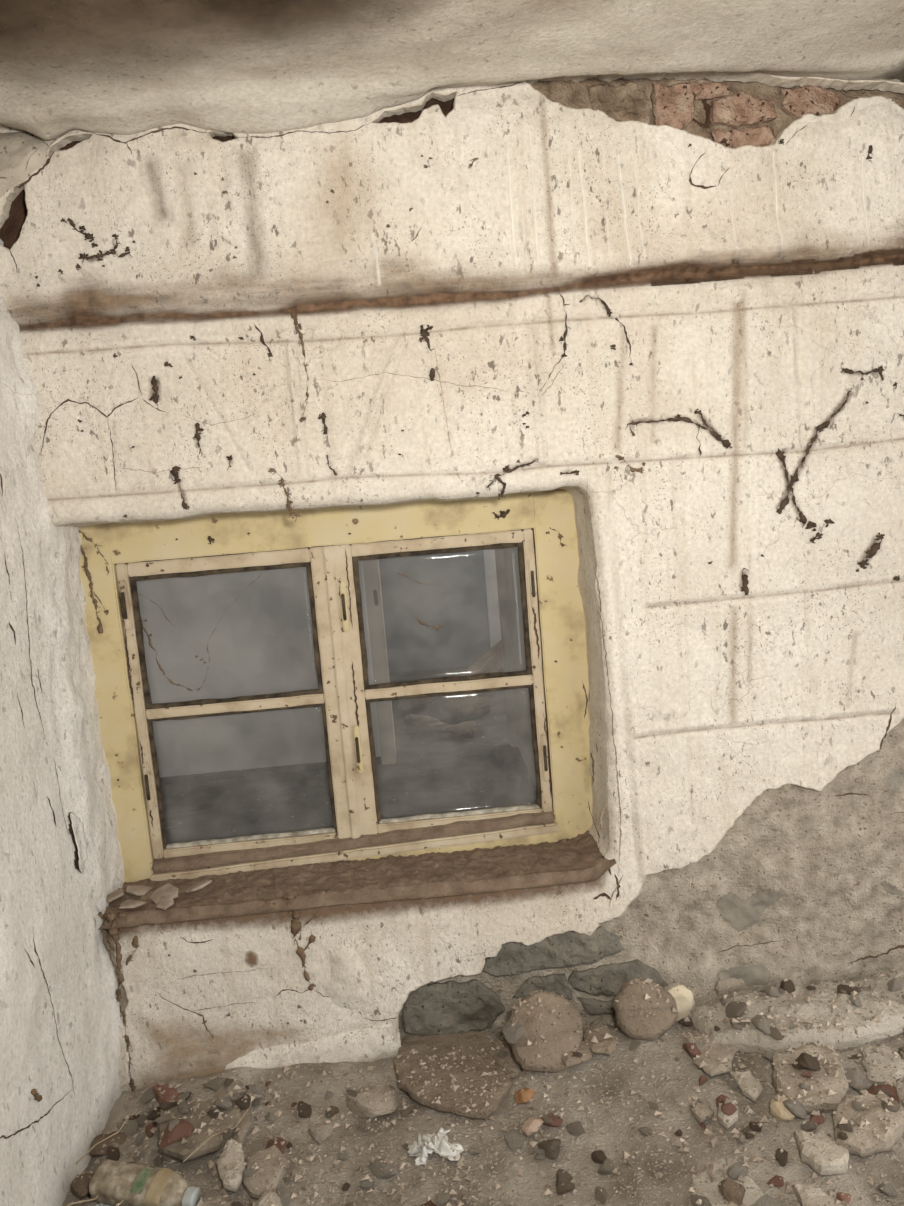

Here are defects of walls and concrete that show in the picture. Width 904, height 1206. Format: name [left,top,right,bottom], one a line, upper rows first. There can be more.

spalling [526,71,904,149]
crack [0,82,523,269]
crack [38,366,258,492]
peeling [339,547,353,626]
crack [0,474,68,831]
peeling [120,595,135,708]
peeling [351,660,359,726]
spalling [396,718,904,1043]
crack [0,928,75,1139]
crack [155,968,329,1033]